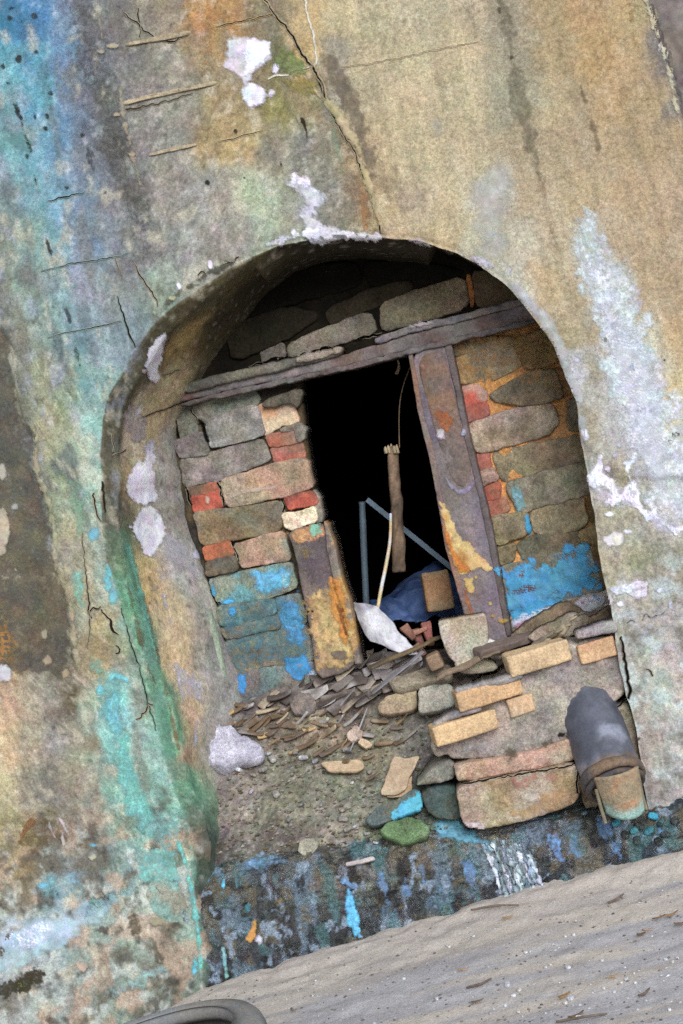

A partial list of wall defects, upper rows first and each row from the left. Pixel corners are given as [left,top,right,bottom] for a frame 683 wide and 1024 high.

crack [121,8,189,44]
water stain [223,36,317,109]
crack [216,0,478,234]
water stain [266,173,382,246]
crack [41,252,158,347]
water stain [575,207,683,535]
crack [81,481,156,731]